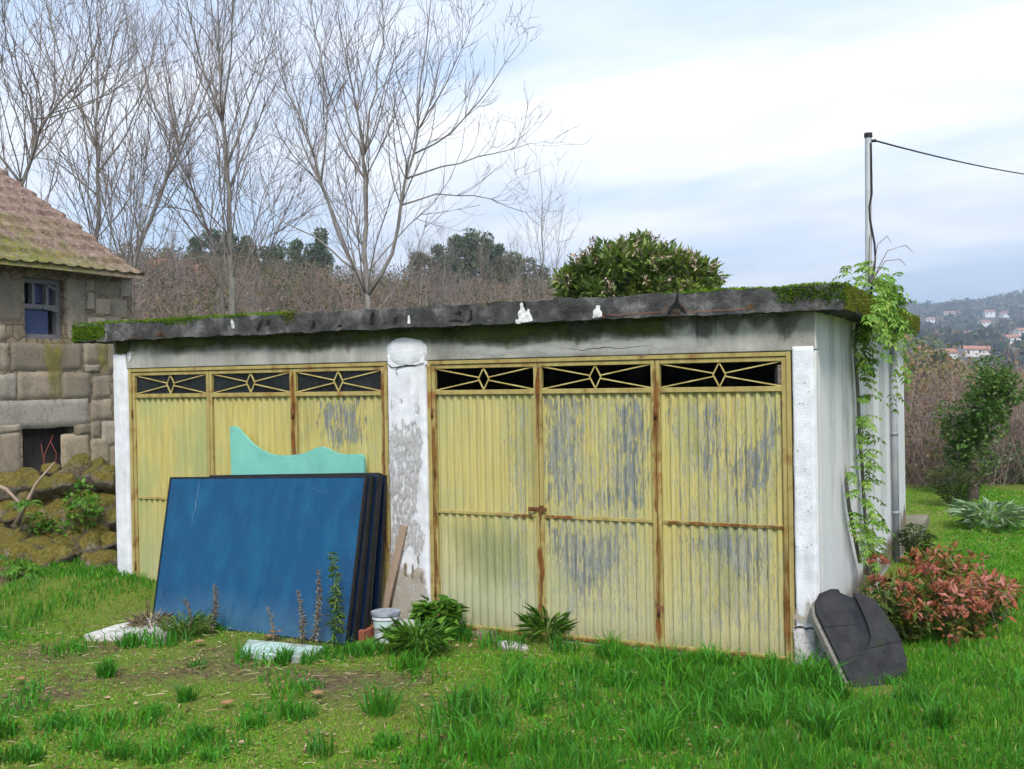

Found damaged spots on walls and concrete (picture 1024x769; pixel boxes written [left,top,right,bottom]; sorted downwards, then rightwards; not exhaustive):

crack [569,344,651,352]
damp [461,315,797,355]
peeling [316,396,367,451]
peeling [388,397,427,619]
peeling [544,393,649,619]
corrosion [656,521,784,558]
peeling [665,392,783,637]
corrosion [540,615,679,650]